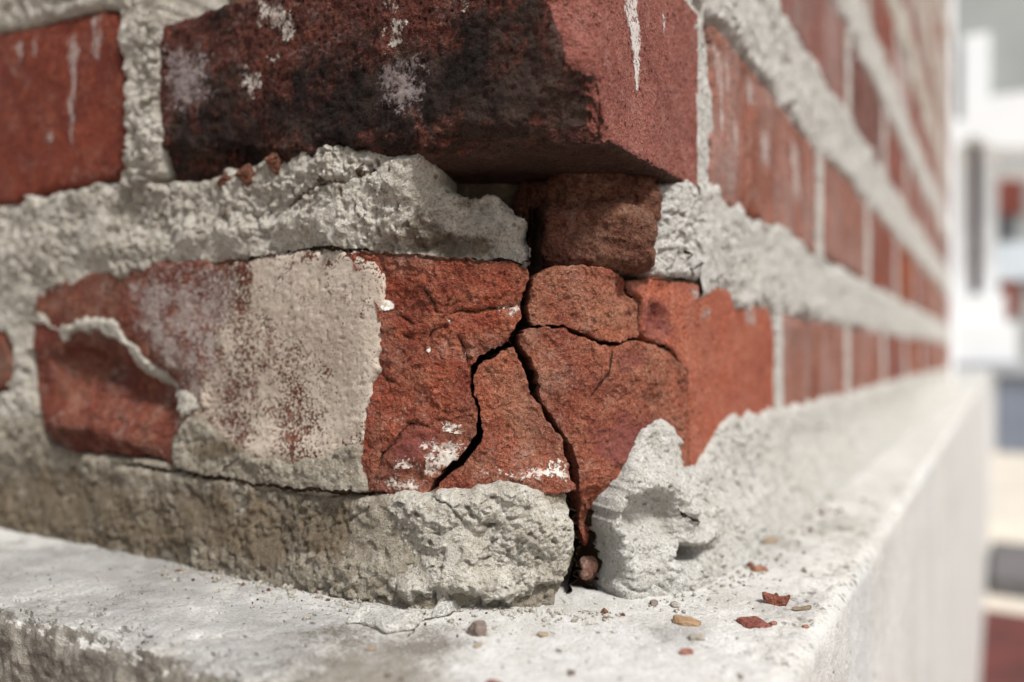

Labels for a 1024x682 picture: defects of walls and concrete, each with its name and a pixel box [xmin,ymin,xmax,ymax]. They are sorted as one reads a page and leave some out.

crack [204,206,720,481]
spalling [176,250,691,546]
crack [120,419,375,496]
damp [383,421,467,492]
damp [481,459,569,481]
damp [595,412,651,464]
crack [565,457,602,595]
crack [677,507,700,526]